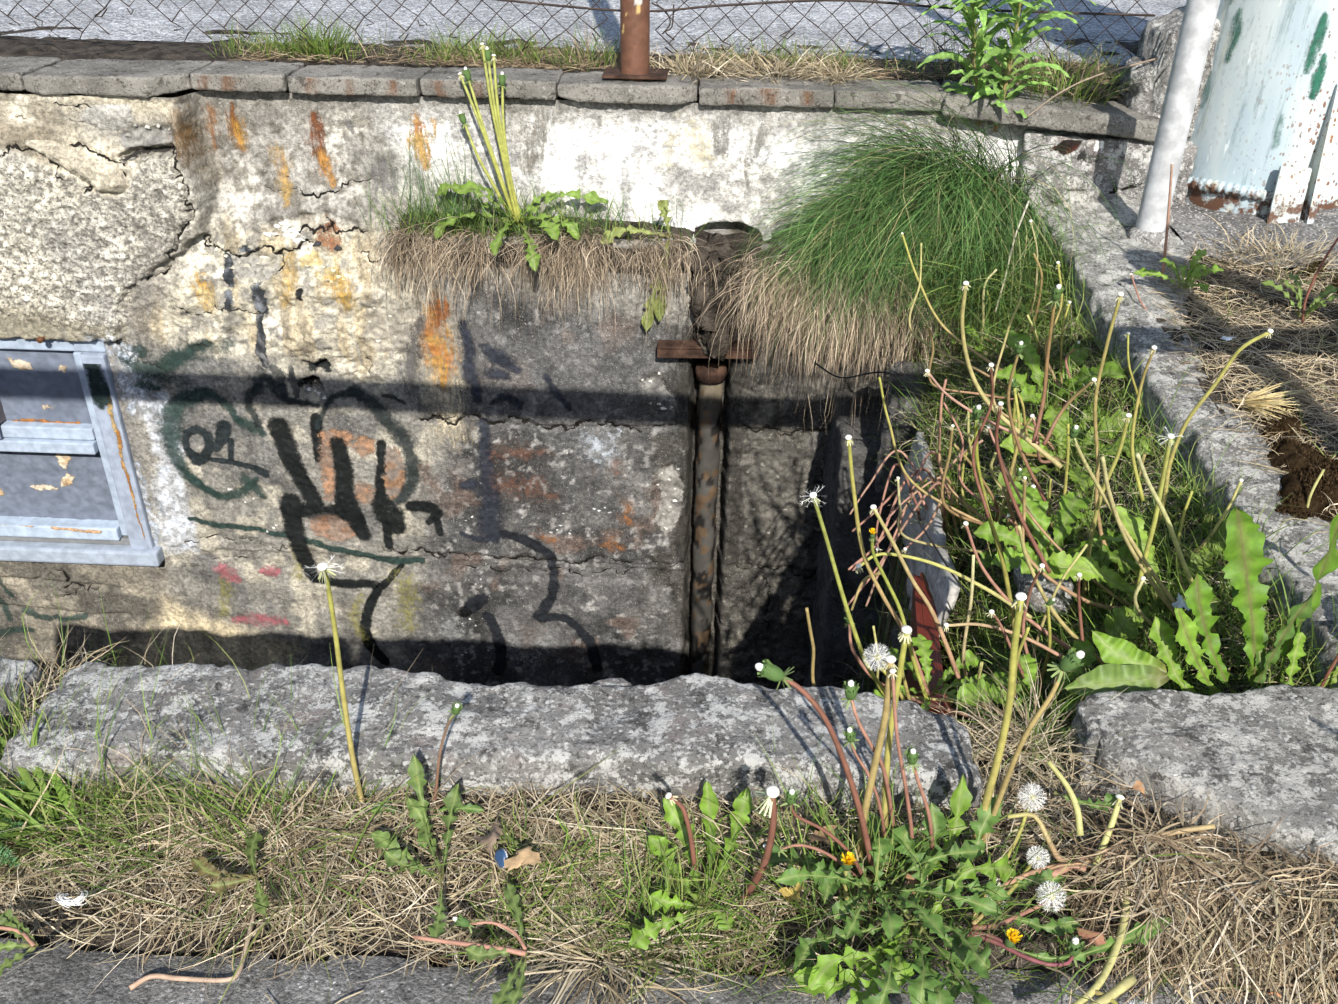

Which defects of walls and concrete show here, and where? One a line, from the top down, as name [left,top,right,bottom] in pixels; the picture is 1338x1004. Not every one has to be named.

spalling [119,123,175,163]
rust [207,102,246,151]
rust [309,112,337,188]
crack [146,148,399,315]
crack [414,414,676,433]
crack [747,426,826,436]
crack [382,545,679,577]